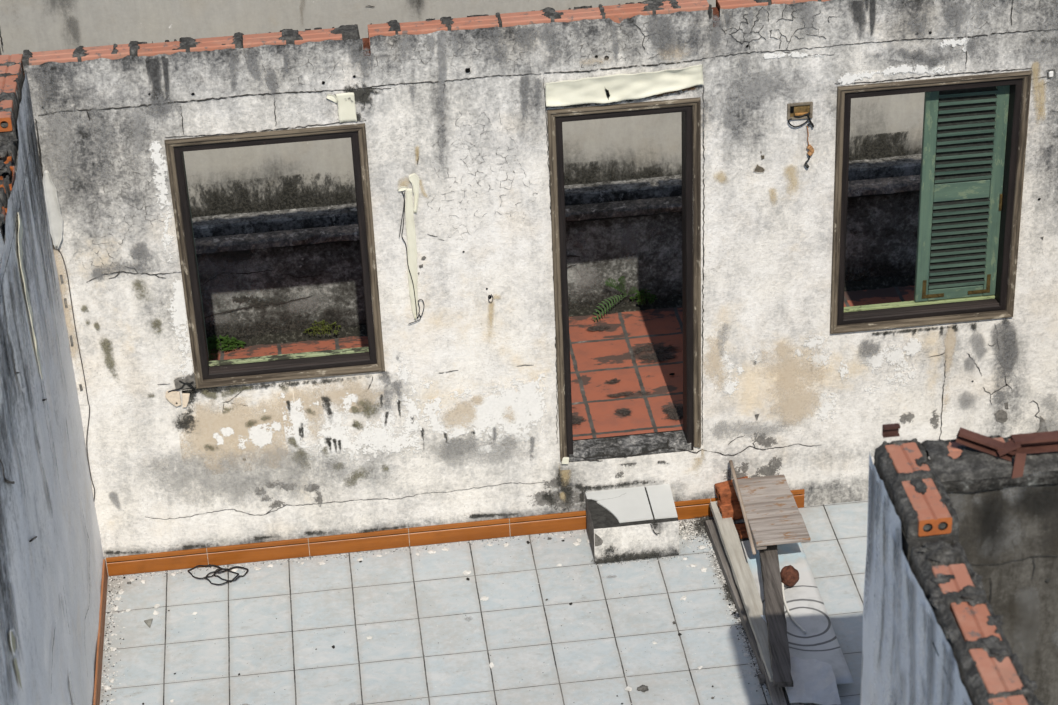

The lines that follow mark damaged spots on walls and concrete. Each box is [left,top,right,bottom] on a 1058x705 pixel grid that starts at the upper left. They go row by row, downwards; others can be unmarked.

leakage [133,56,181,153]
peeling [149,140,176,263]
peeling [398,173,426,320]
crack [0,0,1058,462]
leakage [175,377,354,433]
flaking render [255,480,323,509]
leakage [288,409,311,468]
leakage [334,463,366,485]
peeling [165,278,547,472]
leakage [352,371,424,446]
leakage [860,325,958,357]
leakage [965,319,1018,401]